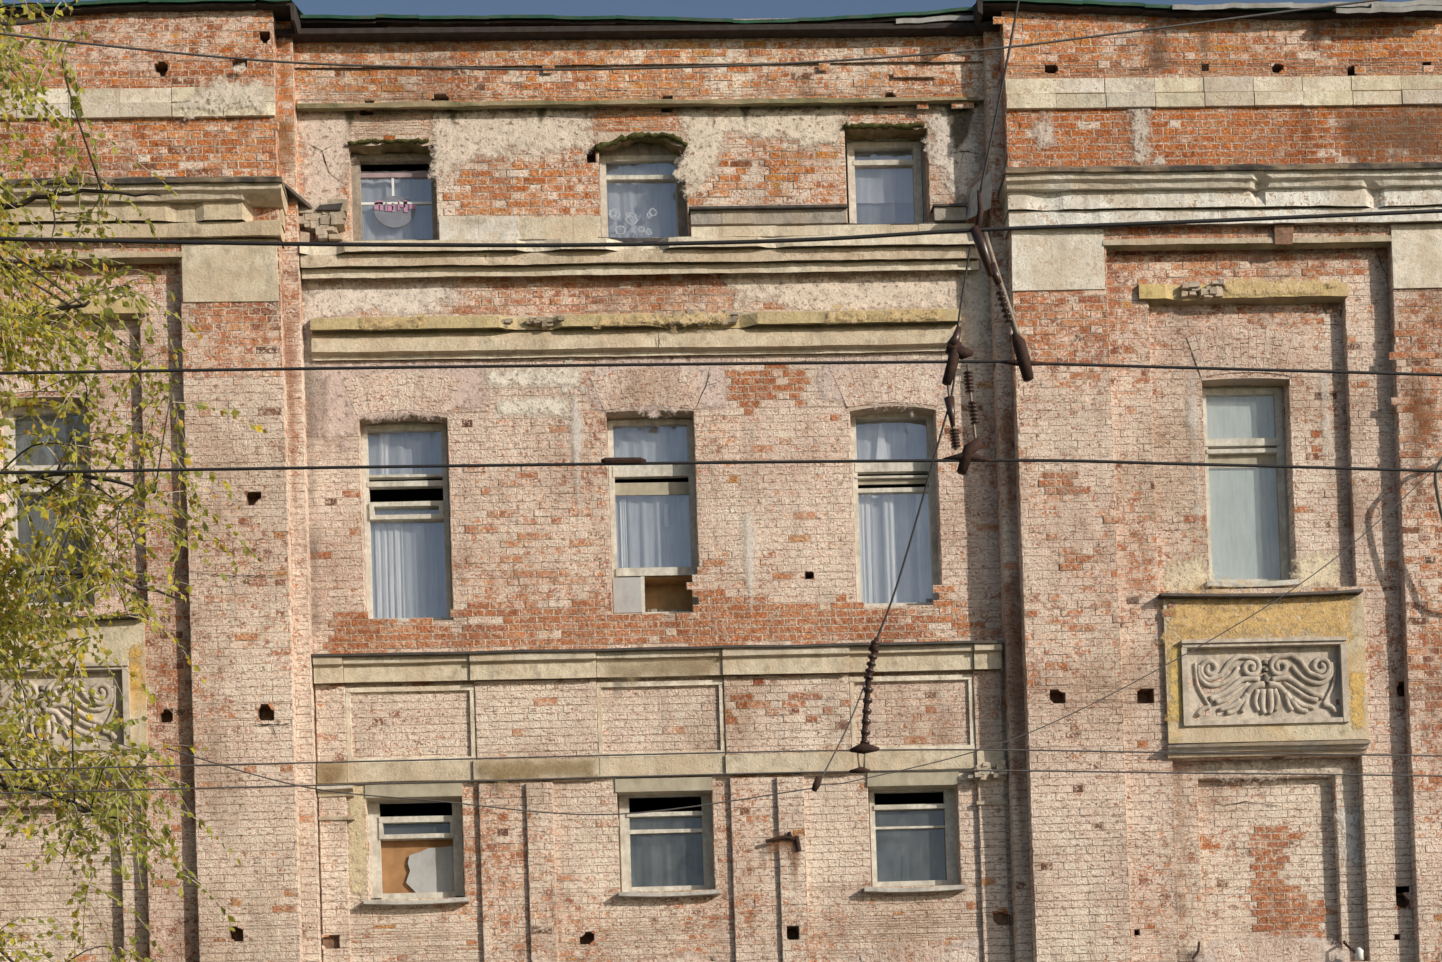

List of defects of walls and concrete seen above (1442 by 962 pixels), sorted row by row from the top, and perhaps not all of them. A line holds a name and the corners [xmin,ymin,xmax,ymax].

flaking render [434,155,584,216]
flaking render [708,142,818,198]
flaking render [721,365,811,416]
flaking render [323,466,1002,654]
flaking render [1243,825,1337,939]